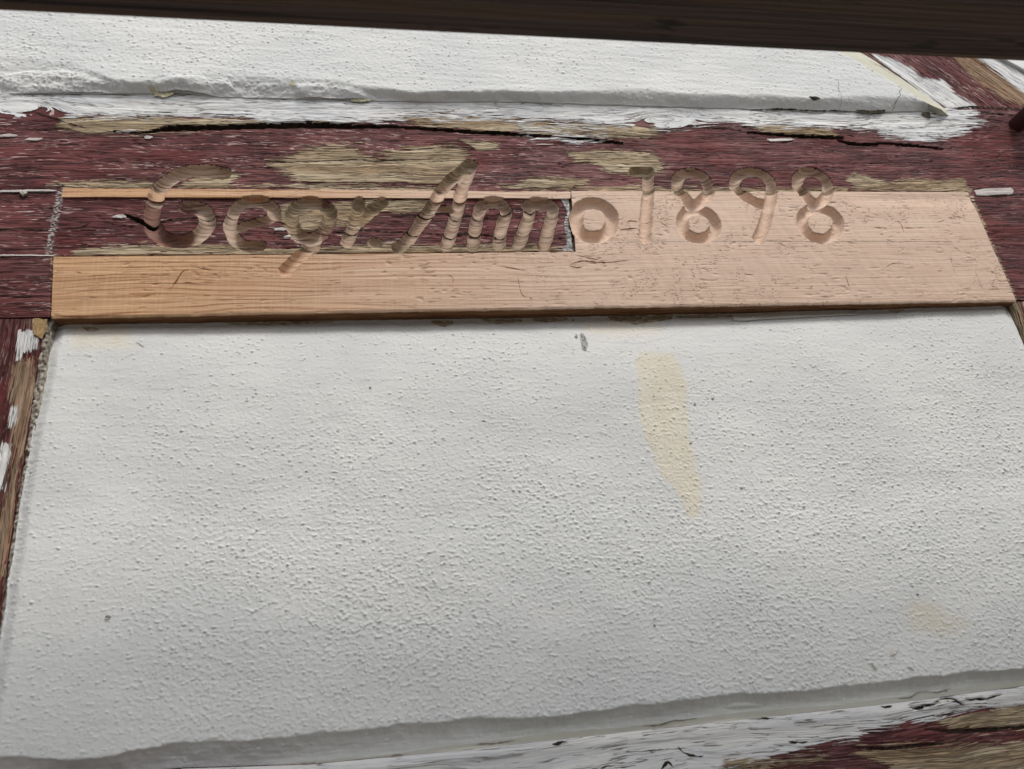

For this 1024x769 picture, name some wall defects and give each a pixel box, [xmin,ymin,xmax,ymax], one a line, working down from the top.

crack [113,122,624,144]
peeling [0,177,161,193]
peeling [54,112,1014,288]
damp [575,315,707,525]
peeling [0,356,38,593]
peeling [721,750,831,769]
peeling [852,705,1024,769]